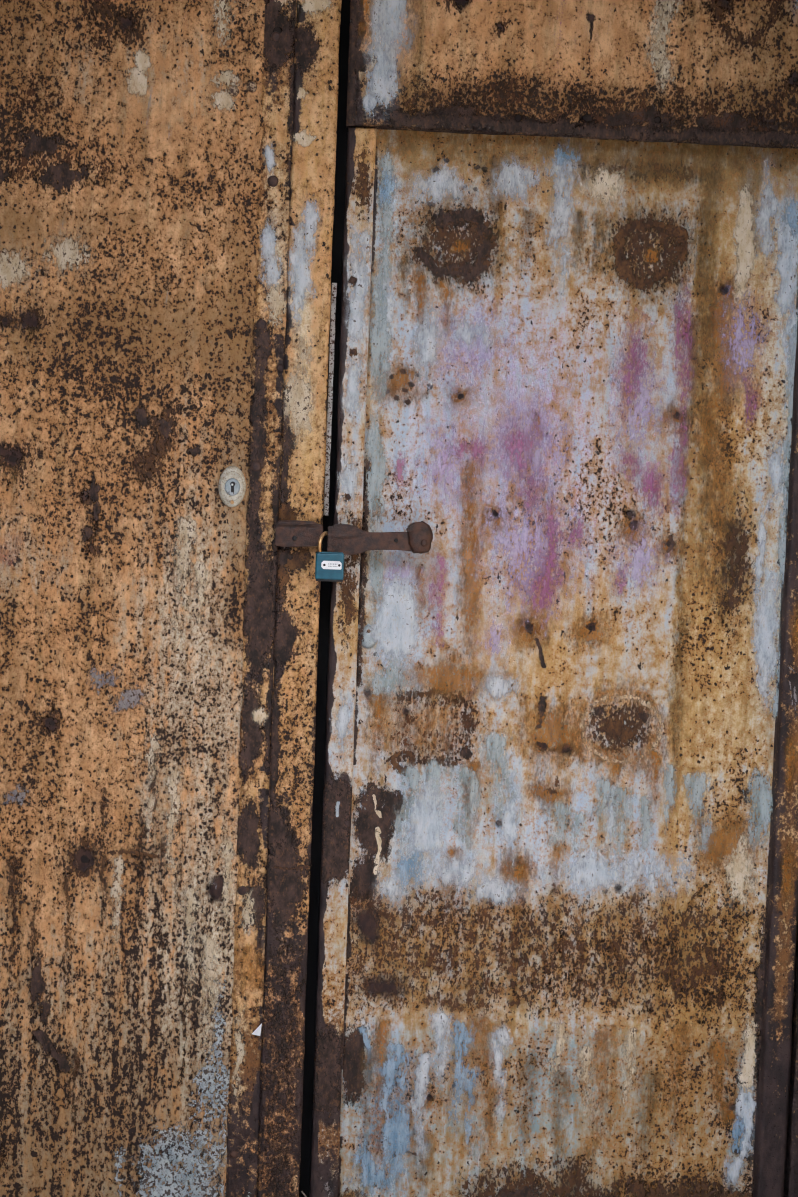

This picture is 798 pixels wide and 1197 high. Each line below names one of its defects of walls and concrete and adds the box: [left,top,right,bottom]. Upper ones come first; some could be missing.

rust [0,75,134,197]
rust [263,0,321,198]
rust [0,301,55,343]
rust [346,0,798,648]
rust [72,477,105,582]
rust [335,553,361,651]
rust [236,318,313,1197]
rust [40,827,121,894]
peeling [321,775,405,902]
rust [345,458,754,1197]
rust [26,952,74,1074]
peeling [313,1022,373,1118]